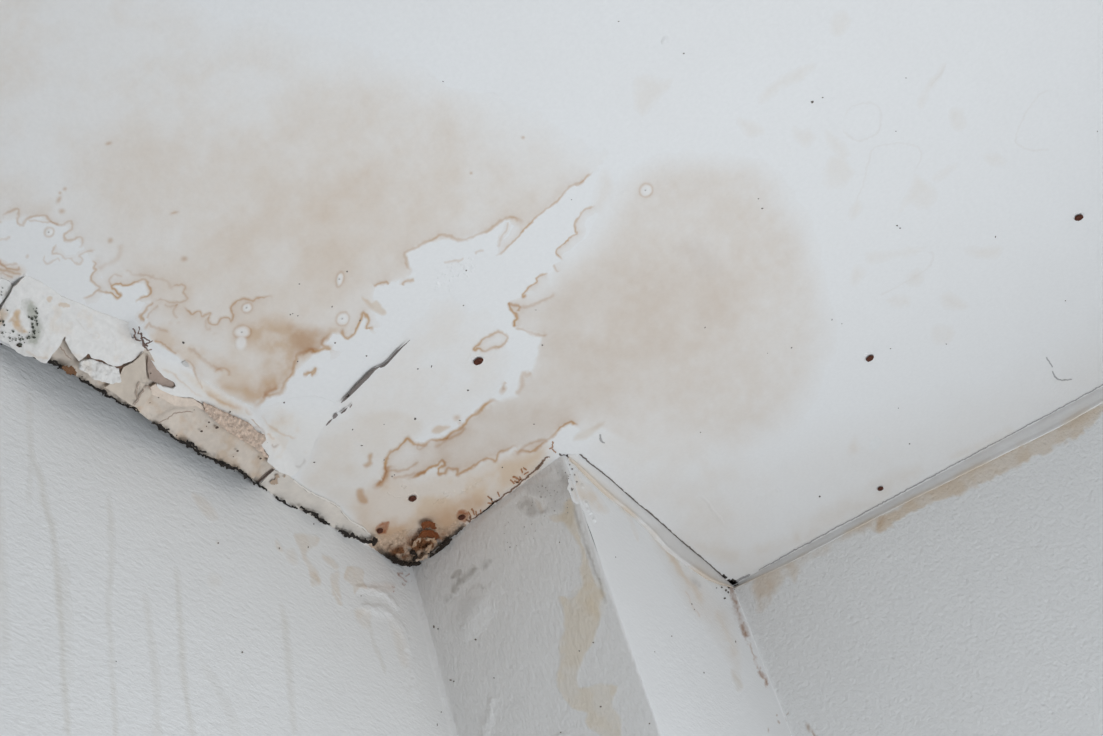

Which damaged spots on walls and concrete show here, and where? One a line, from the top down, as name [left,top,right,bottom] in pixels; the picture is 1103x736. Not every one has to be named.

damp [0,0,1103,582]
damp [274,532,404,675]
corrosion [355,441,569,567]
damp [516,464,744,736]
damp [749,403,1103,615]